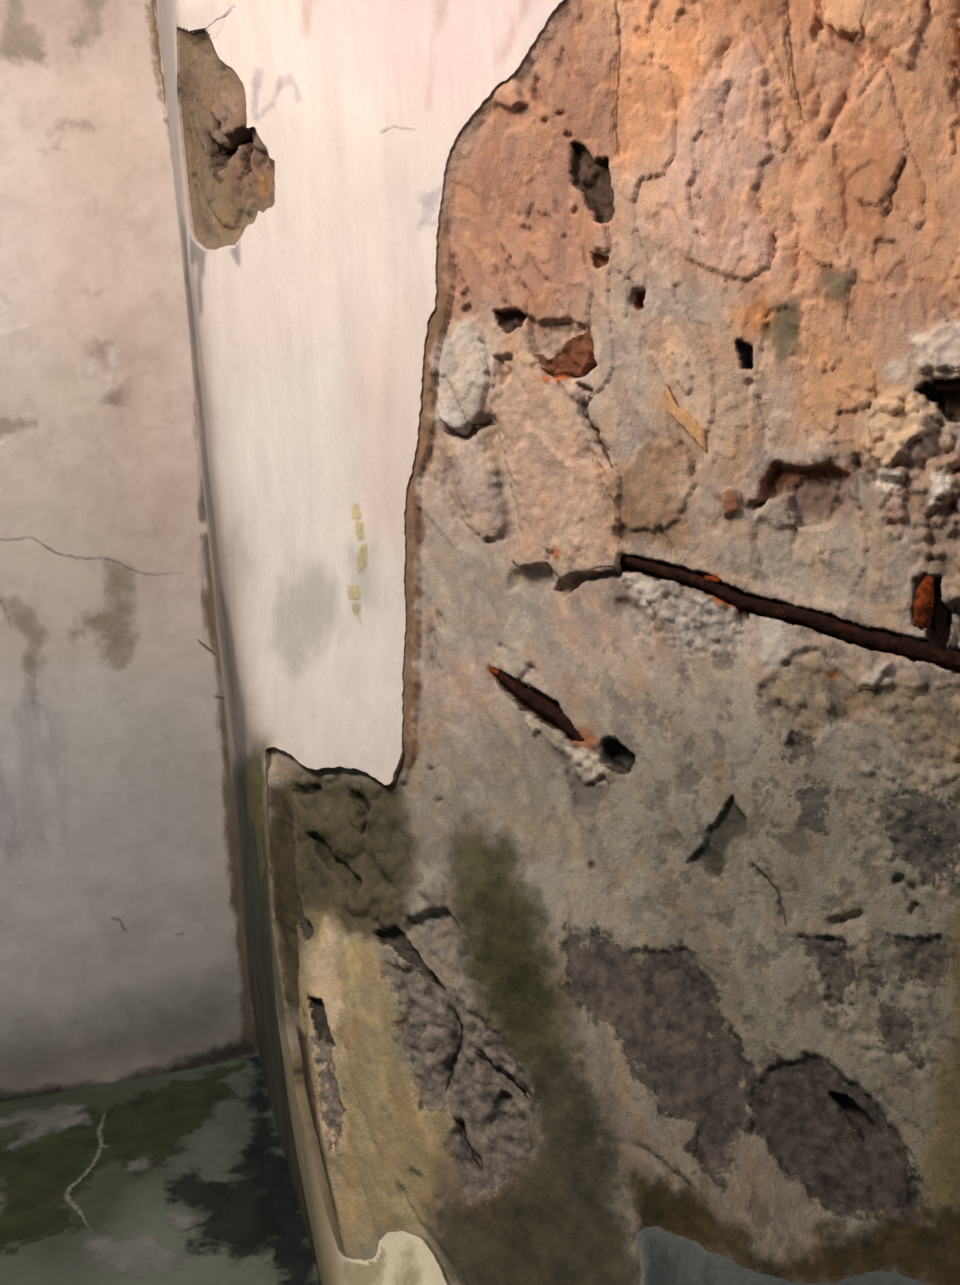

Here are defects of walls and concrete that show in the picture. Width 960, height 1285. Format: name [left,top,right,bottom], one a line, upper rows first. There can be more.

spalling [179,28,275,250]
crack [0,536,178,575]
spalling [268,0,960,1285]
corrosion [702,573,743,613]
corrosion [571,727,598,751]
water stain [122,484,322,1285]
water stain [0,1086,83,1102]
water stain [298,1029,346,1217]
crack [445,1010,529,1170]
water stain [380,960,671,1285]